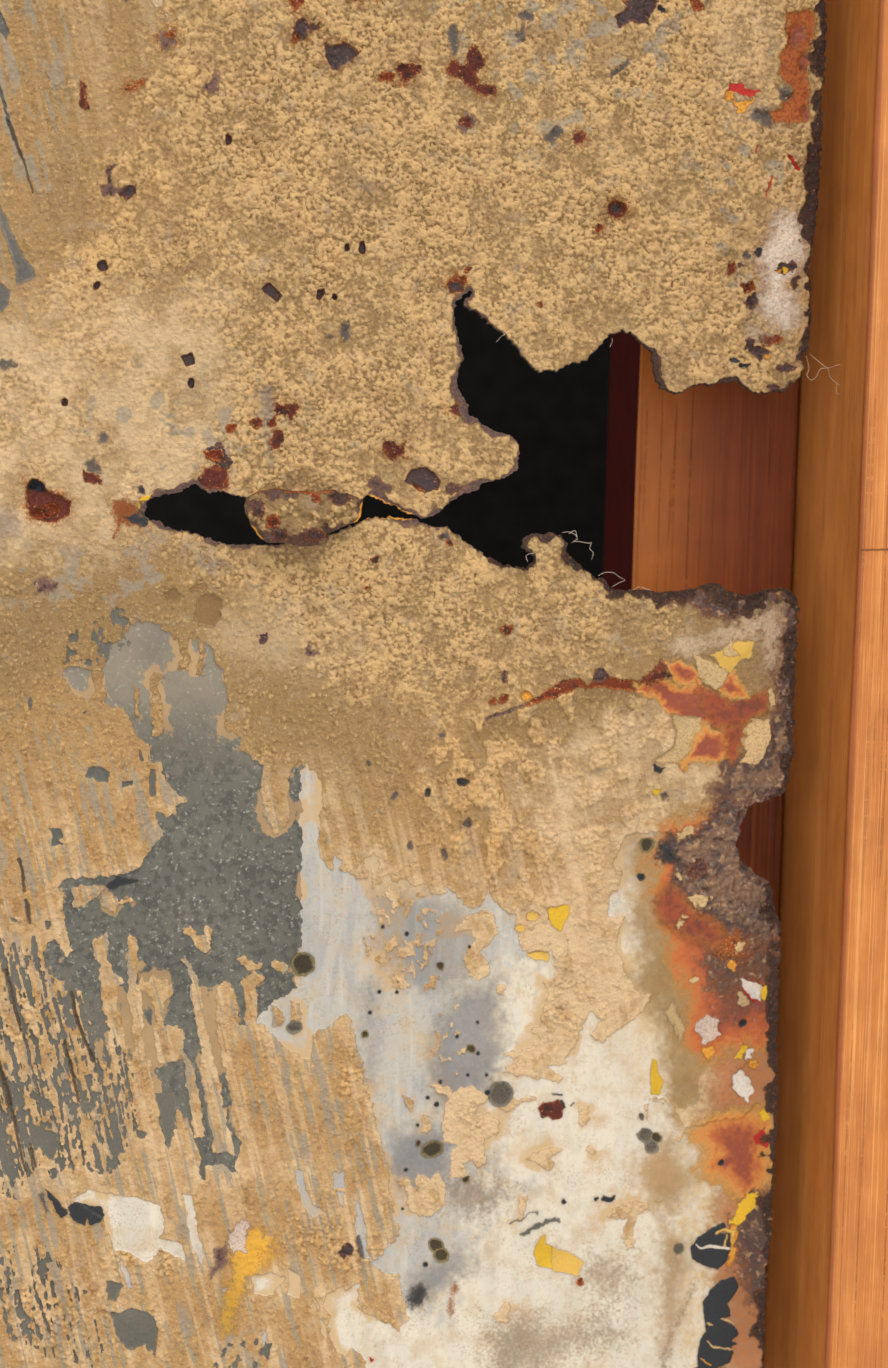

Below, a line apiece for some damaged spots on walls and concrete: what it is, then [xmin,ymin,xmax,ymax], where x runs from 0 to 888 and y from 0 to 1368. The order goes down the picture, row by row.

rust [154,26,177,53]
rust [289,0,360,71]
rust [446,45,497,96]
rust [770,0,827,361]
spalling [261,283,282,302]
peeling [327,320,350,342]
spalling [181,353,195,388]
peeling [43,608,759,1368]
rust [487,532,800,1368]
peeling [727,941,768,1027]
peeling [732,1045,770,1148]